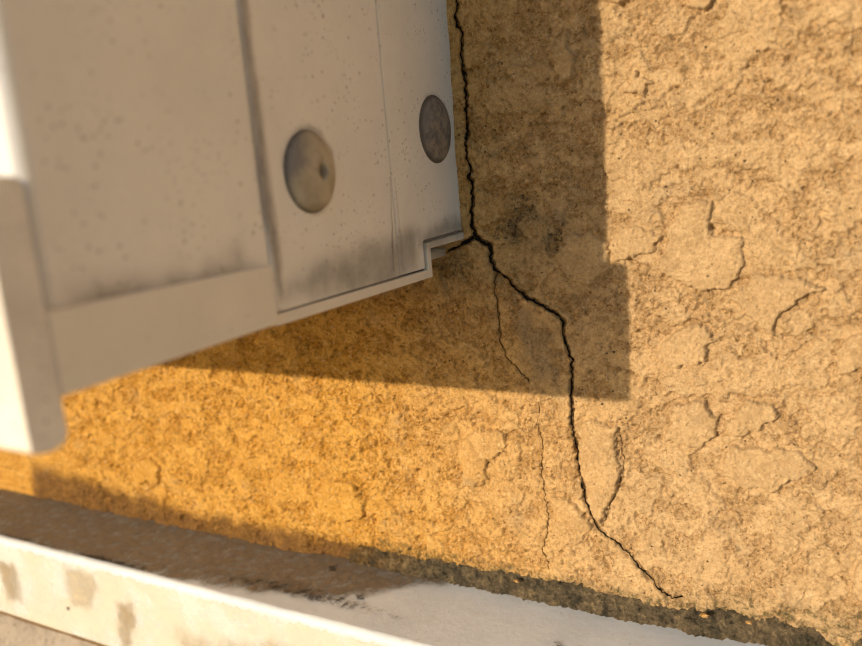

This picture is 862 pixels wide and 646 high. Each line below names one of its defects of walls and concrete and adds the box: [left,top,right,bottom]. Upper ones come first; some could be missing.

crack [448,0,683,599]
water stain [119,605,134,645]